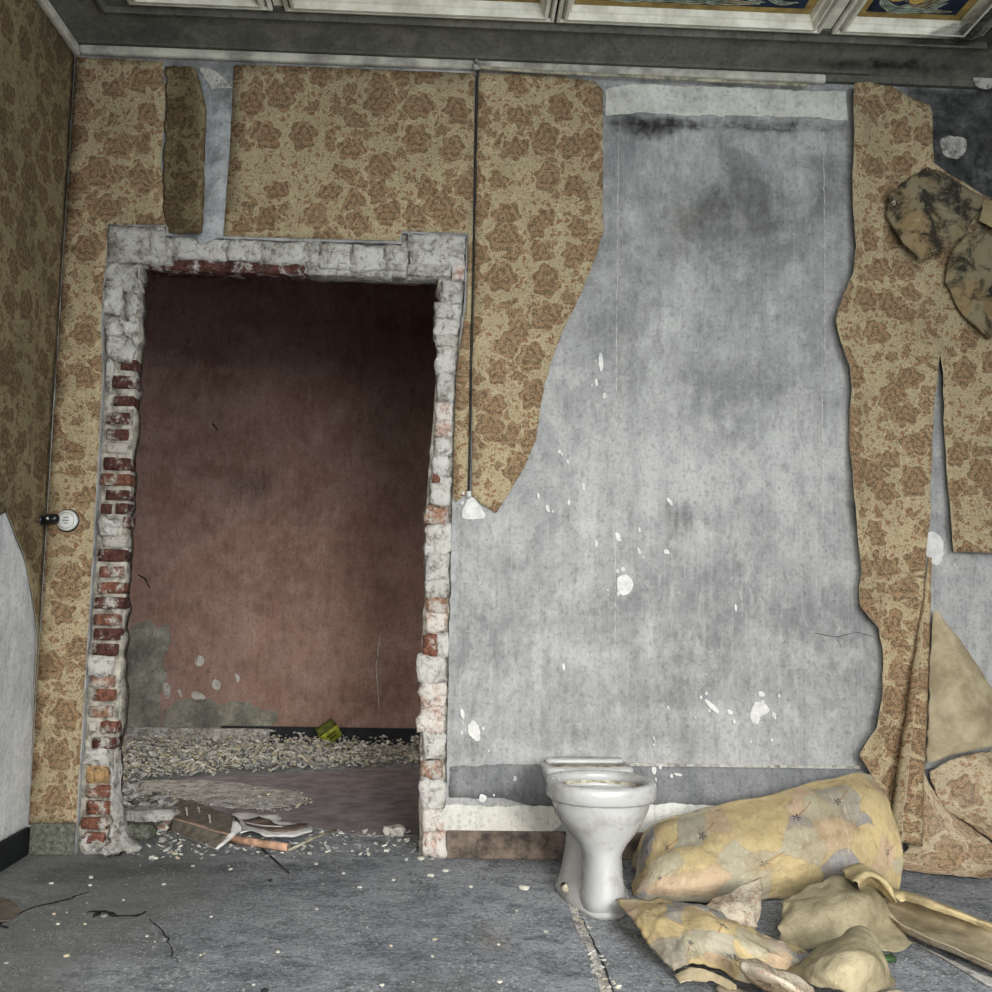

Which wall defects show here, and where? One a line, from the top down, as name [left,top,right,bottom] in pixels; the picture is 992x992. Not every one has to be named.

flaking render [605,84,848,121]
water stain [613,120,696,134]
water stain [908,89,992,199]
peeling [940,136,967,159]
spalling [461,491,485,520]
spalling [926,532,944,566]
spalling [607,567,633,596]
spalling [0,513,34,840]
spalling [750,691,776,724]
peeling [903,610,992,879]
spalling [137,780,309,809]
spalling [637,803,710,832]